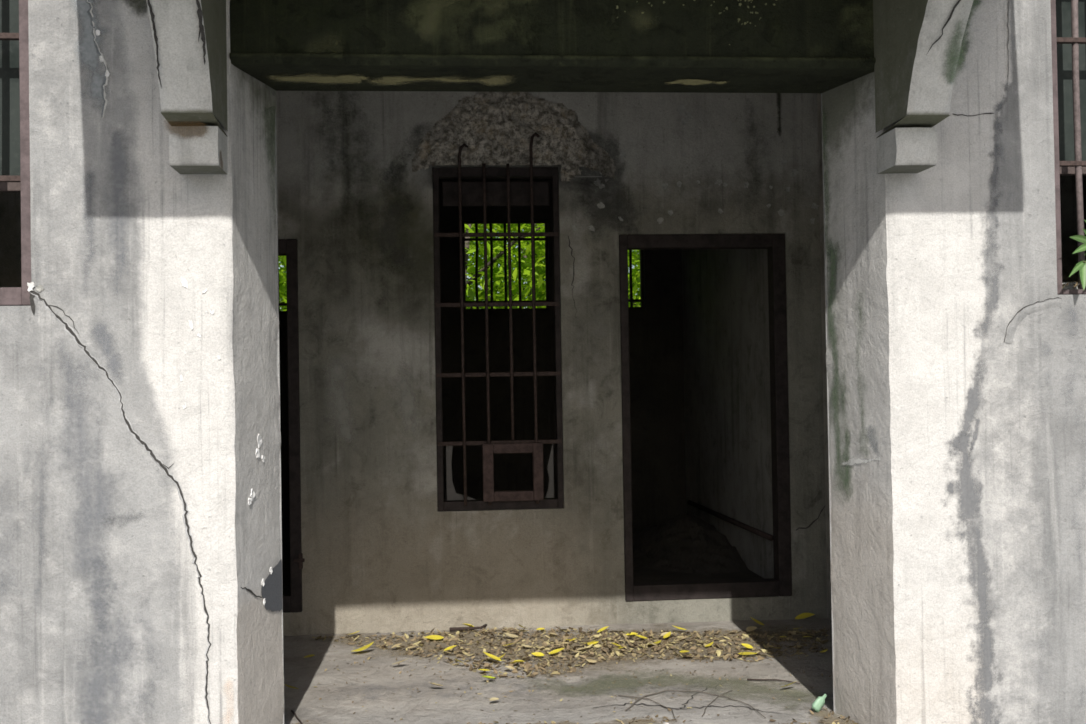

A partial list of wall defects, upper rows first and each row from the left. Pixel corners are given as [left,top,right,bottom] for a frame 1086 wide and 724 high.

crack [147,0,162,87]
crack [196,0,206,65]
crack [926,0,962,82]
spalling [272,74,616,182]
leakage [986,85,1008,254]
leakage [975,266,1002,333]
crack [27,282,211,724]
spalling [261,559,282,611]
leakage [947,364,1001,724]
crack [594,684,781,714]